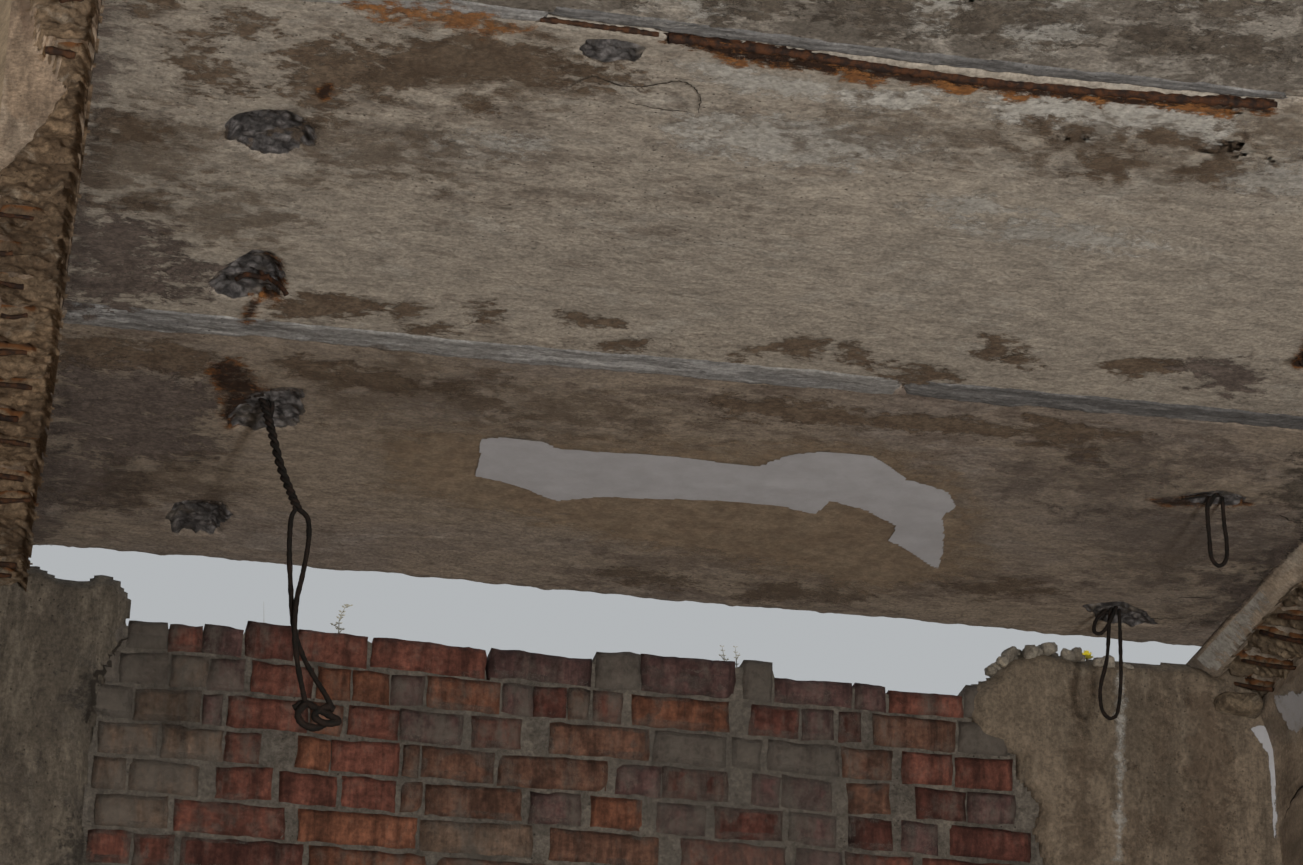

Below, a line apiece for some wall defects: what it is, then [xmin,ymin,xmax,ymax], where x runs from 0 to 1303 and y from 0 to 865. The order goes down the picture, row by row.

spalling [224,109,318,154]
leakage [98,0,650,160]
corrosion [342,0,1278,121]
leakage [646,58,1303,196]
leakage [678,0,1302,79]
spalling [0,0,105,592]
leakage [32,54,234,545]
spalling [207,250,289,299]
corrosion [238,252,289,325]
leakage [265,291,508,338]
spalling [165,499,233,534]
spalling [1213,581,1303,838]